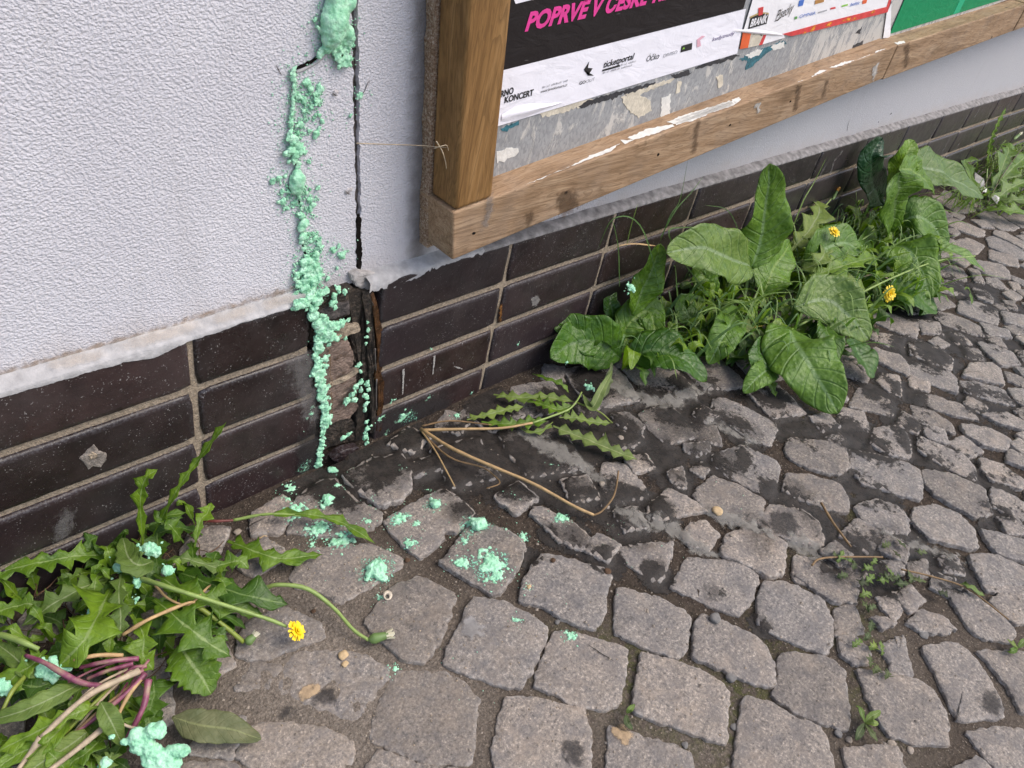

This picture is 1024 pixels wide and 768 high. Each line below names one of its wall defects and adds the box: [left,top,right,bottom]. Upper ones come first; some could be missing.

crack [351,10,363,269]
spalling [0,78,1024,450]
spalling [79,444,107,469]